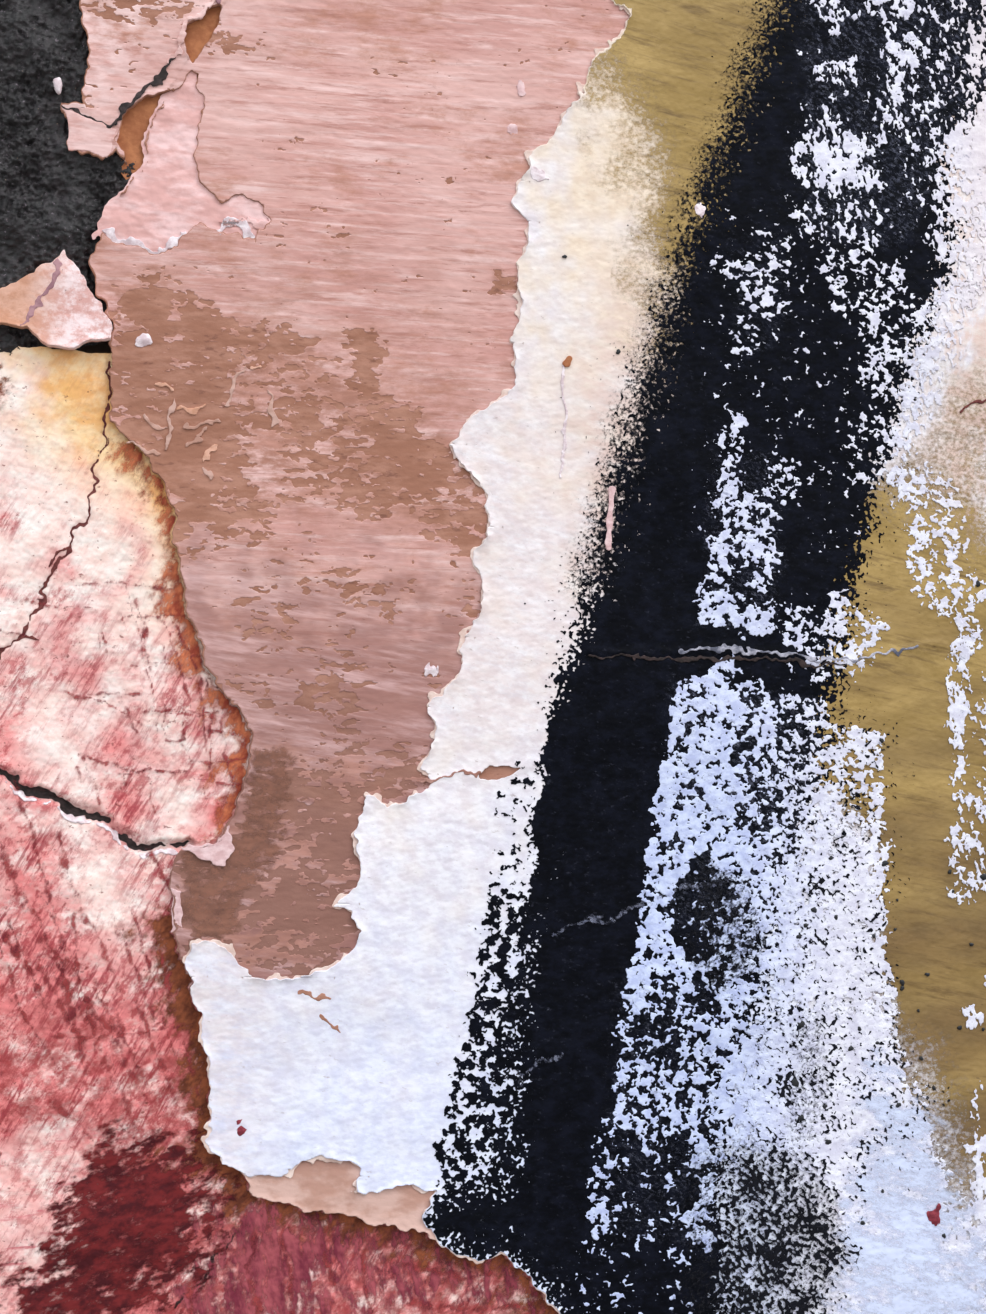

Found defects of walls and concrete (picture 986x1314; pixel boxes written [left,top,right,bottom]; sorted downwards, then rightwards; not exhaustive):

crack [61,0,221,128]
peeling [695,202,706,218]
crack [0,361,112,660]
spalling [0,0,632,1314]
crack [588,644,919,669]
crack [0,768,189,859]